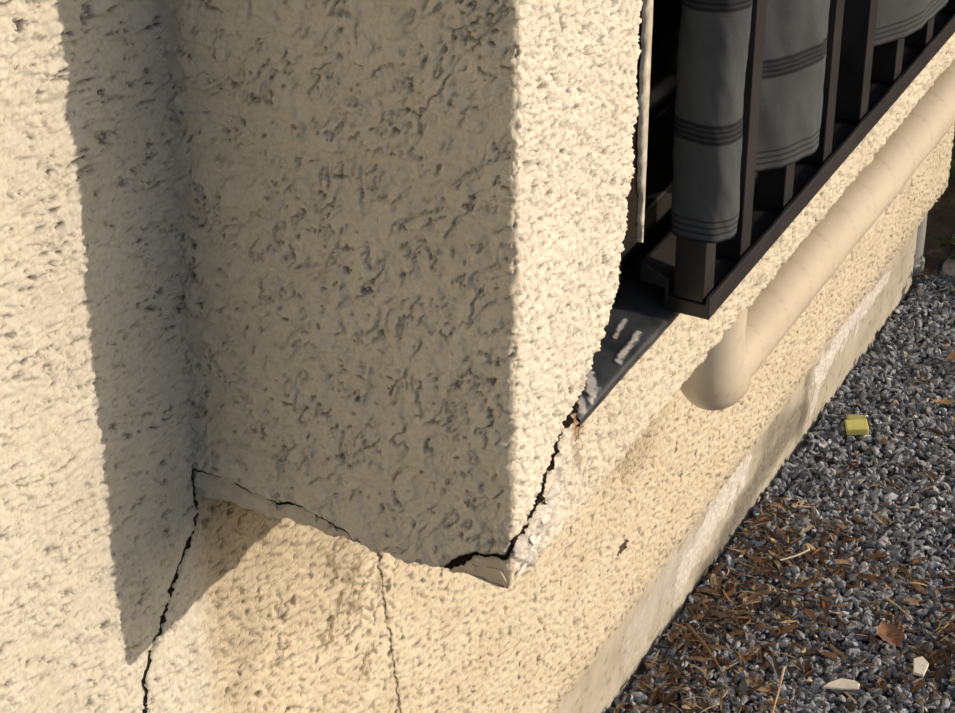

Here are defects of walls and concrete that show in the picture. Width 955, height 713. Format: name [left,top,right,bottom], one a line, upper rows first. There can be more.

crack [141,464,402,713]
crack [444,396,580,569]